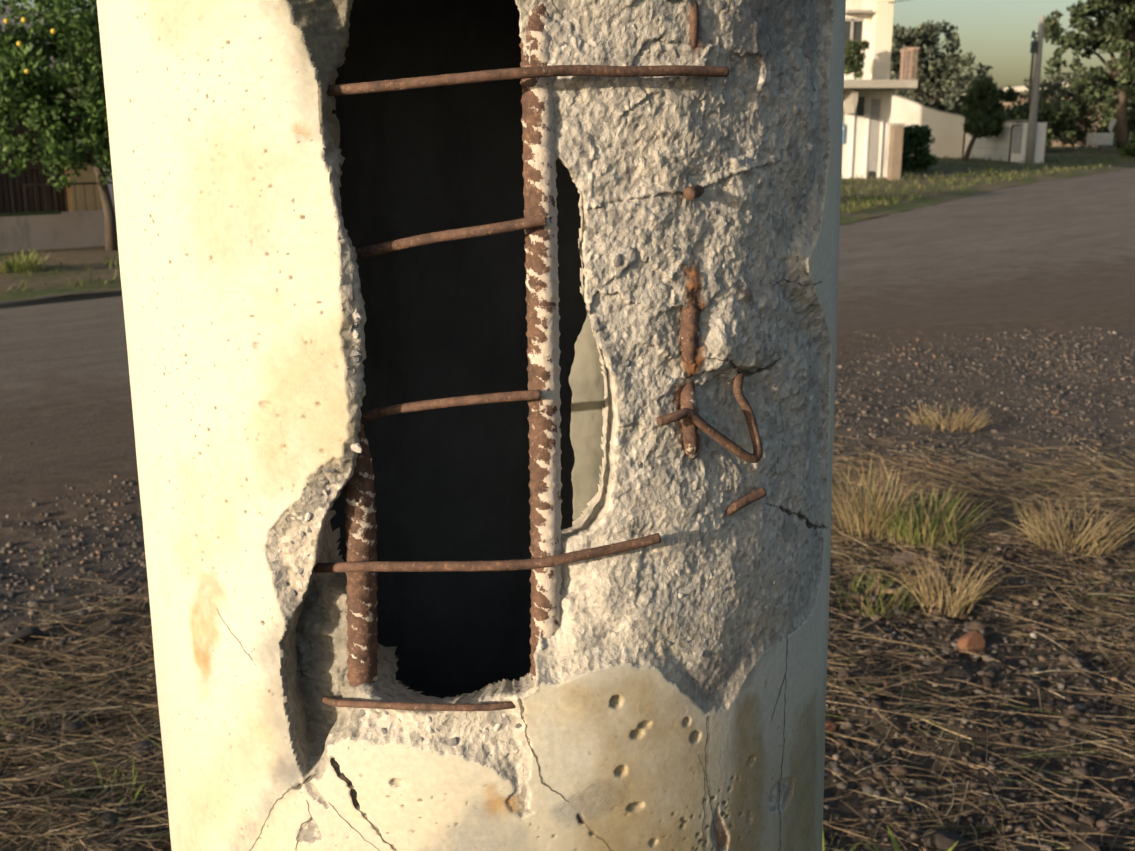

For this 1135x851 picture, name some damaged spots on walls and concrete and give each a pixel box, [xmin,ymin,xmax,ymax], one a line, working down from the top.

corrosion [684,263,704,311]
spalling [265,0,834,818]
corrosion [675,335,703,409]
spalling [297,817,322,845]
crack [249,758,397,851]
crack [517,698,613,851]
crack [697,716,719,851]
crack [771,636,788,851]